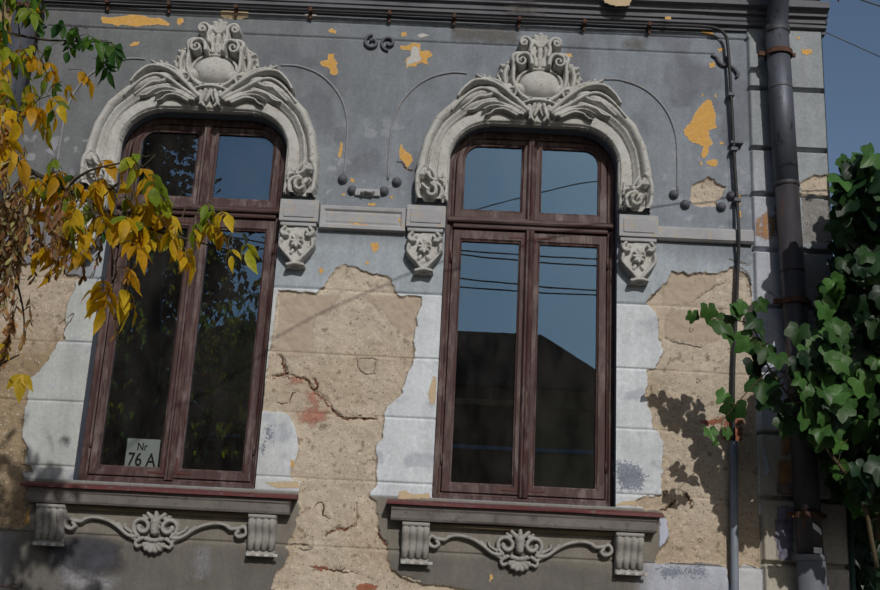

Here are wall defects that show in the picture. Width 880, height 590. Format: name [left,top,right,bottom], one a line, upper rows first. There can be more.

peeling [101,15,184,27]
peeling [320,53,338,76]
peeling [400,32,432,68]
peeling [683,94,727,207]
spalling [800,174,830,244]
spalling [0,261,84,530]
crack [274,355,378,421]
spalling [263,242,473,590]
spalling [616,267,760,587]
crack [288,501,358,574]